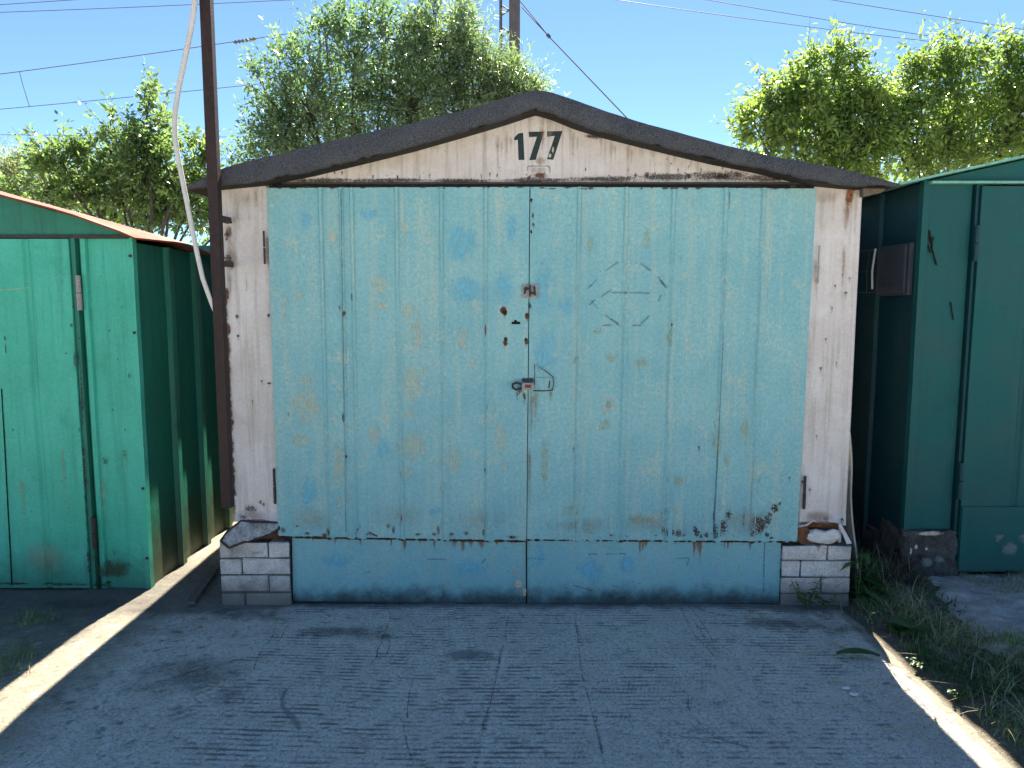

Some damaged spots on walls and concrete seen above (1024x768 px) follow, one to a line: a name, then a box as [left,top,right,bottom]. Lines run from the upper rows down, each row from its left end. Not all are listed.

corrosion [277,517,797,552]